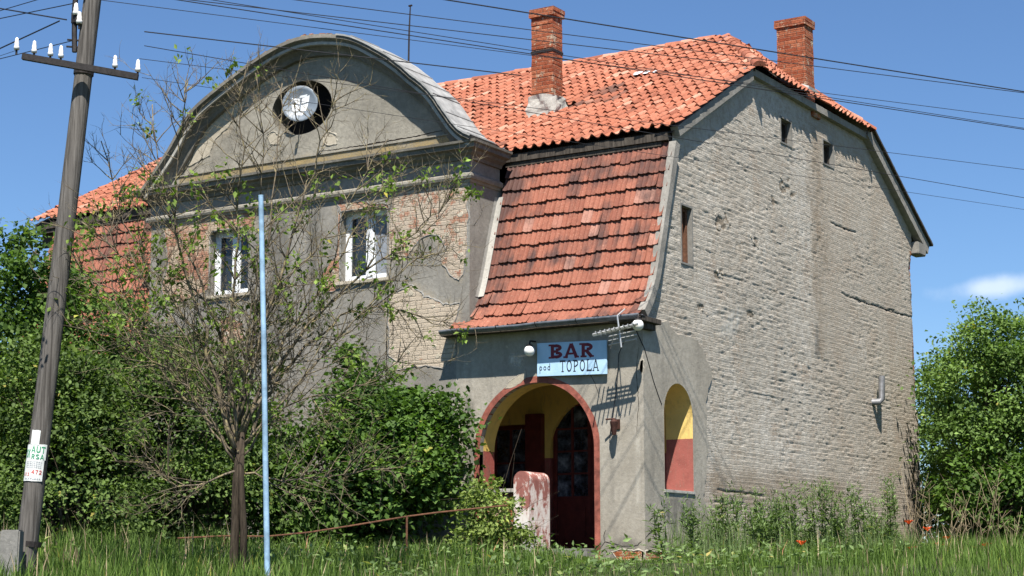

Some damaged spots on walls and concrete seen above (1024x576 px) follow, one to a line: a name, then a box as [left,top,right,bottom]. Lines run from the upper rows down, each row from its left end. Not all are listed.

flaking render [320,182,470,295]
crack [841,293,909,317]